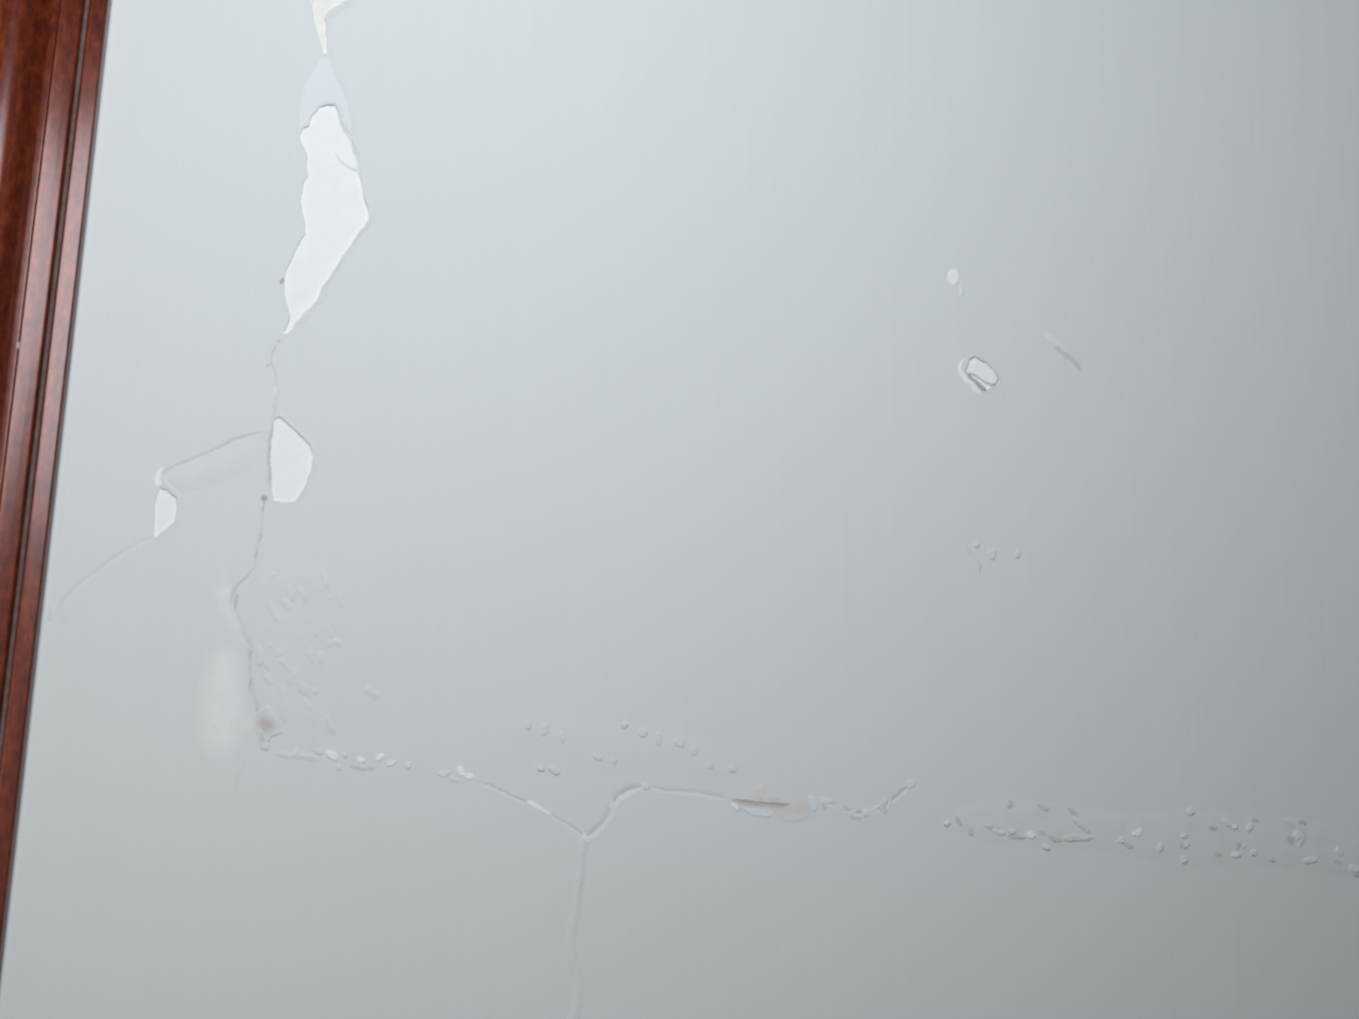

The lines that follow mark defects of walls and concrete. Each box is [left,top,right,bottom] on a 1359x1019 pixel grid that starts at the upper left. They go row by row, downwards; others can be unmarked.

peeling [280,0,377,338]
peeling [958,353,1002,395]
peeling [149,468,184,540]
peeling [261,412,317,506]